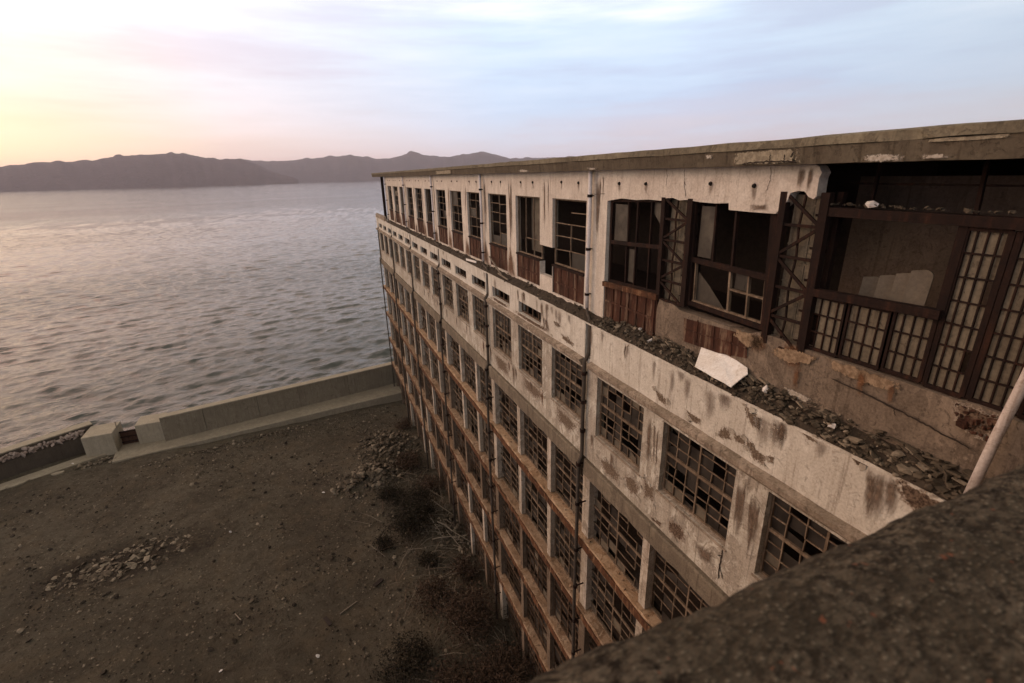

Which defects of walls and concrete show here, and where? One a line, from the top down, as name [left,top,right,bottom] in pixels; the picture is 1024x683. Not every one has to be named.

spalling [733,149,800,165]
peeling [864,154,901,162]
spalling [733,329,817,364]
water stain [376,228,868,546]
spalling [828,359,899,390]
spalling [952,402,999,444]
water stain [866,475,896,511]